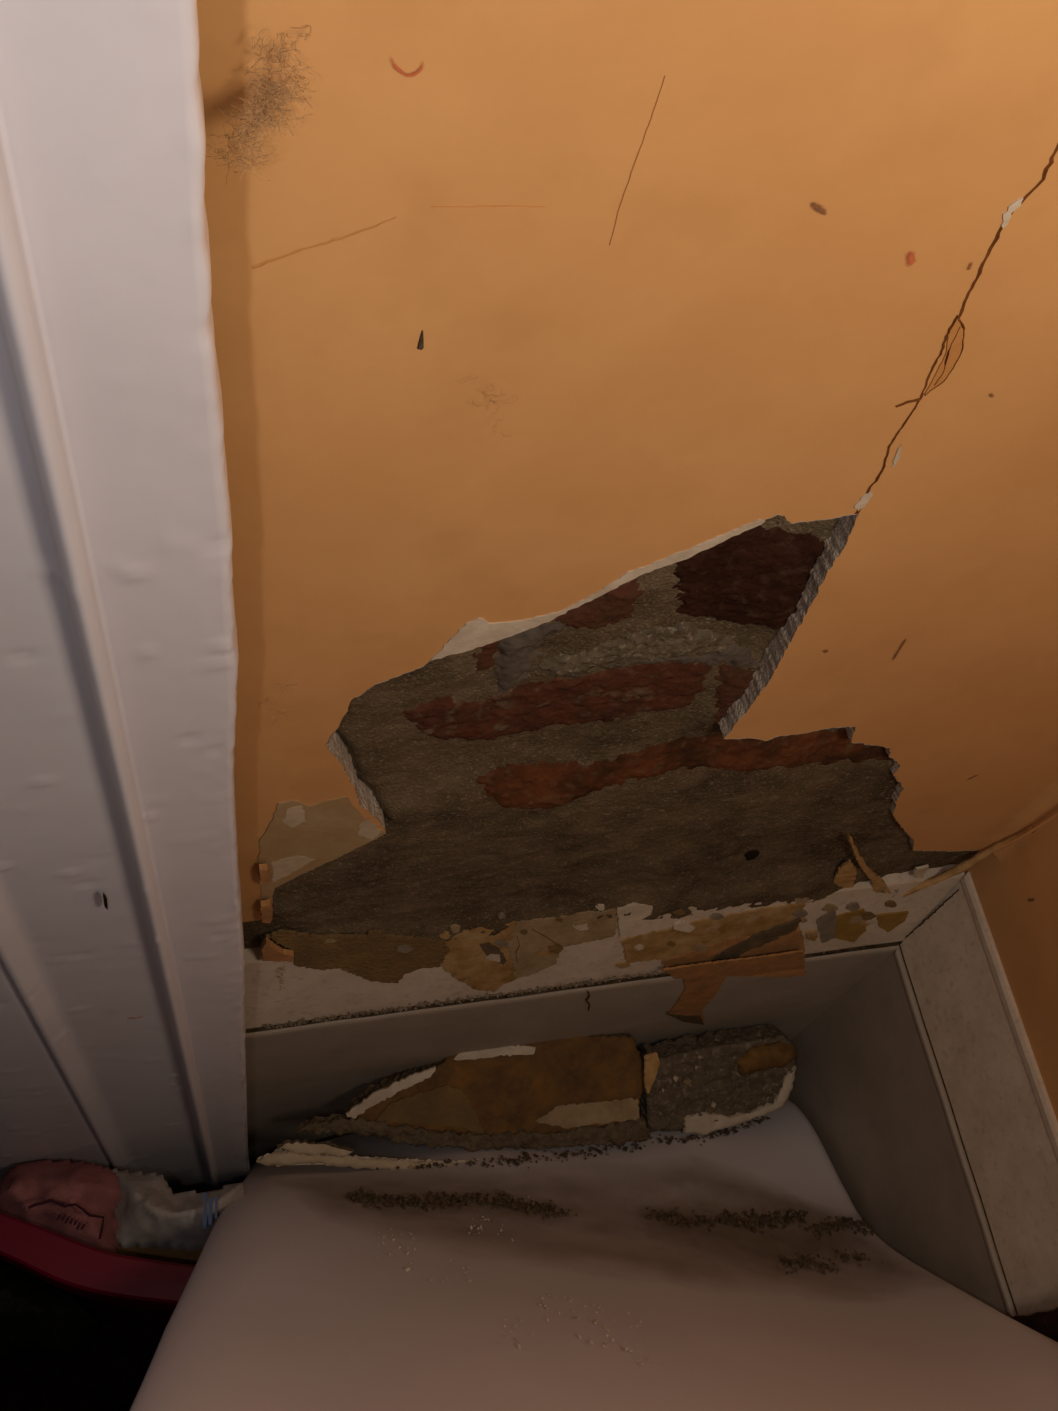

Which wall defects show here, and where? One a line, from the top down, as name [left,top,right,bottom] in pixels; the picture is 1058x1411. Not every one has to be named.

crack [854,144,1058,514]
flaking render [243,514,980,1025]